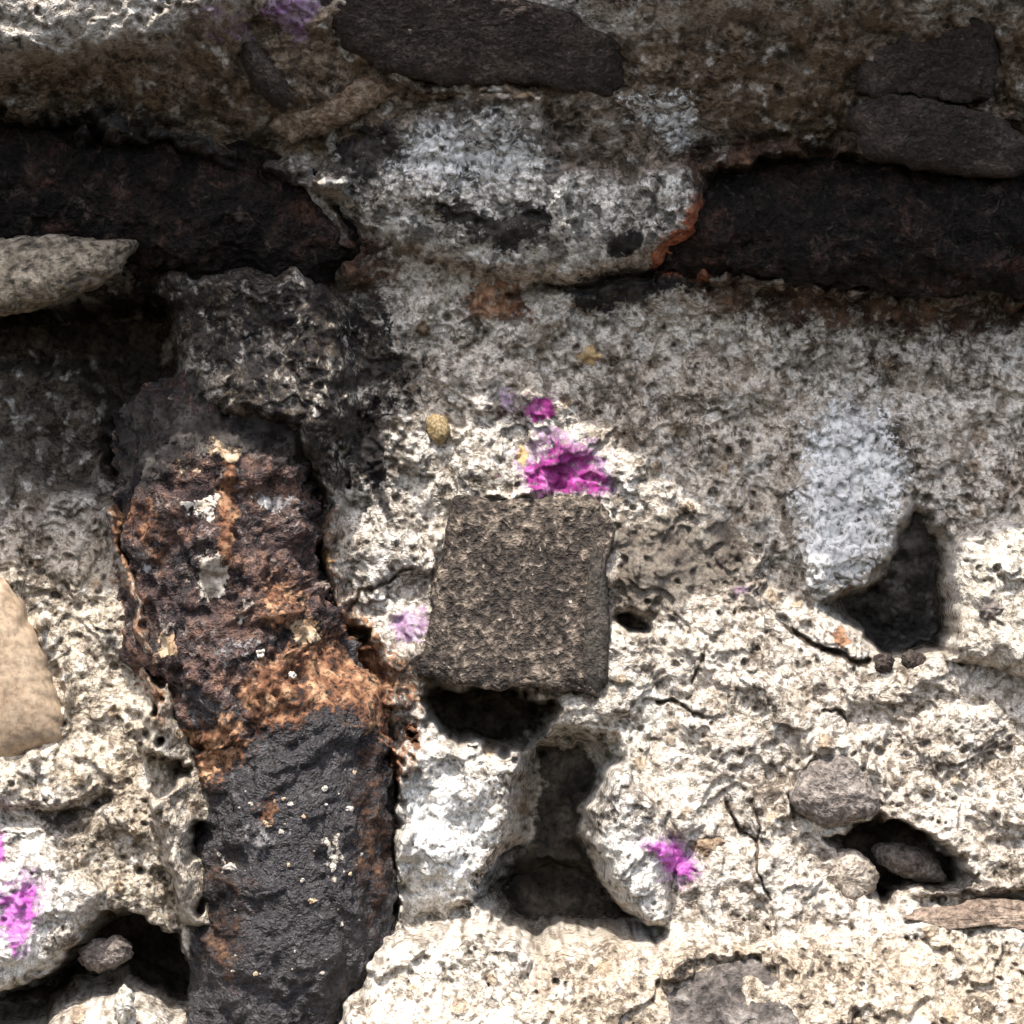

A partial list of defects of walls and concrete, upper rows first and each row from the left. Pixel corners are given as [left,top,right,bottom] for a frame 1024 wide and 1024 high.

rust [651,131,1024,393]
rust [106,370,427,927]
crack [777,618,872,667]
crack [725,800,772,901]
rust [197,851,246,980]